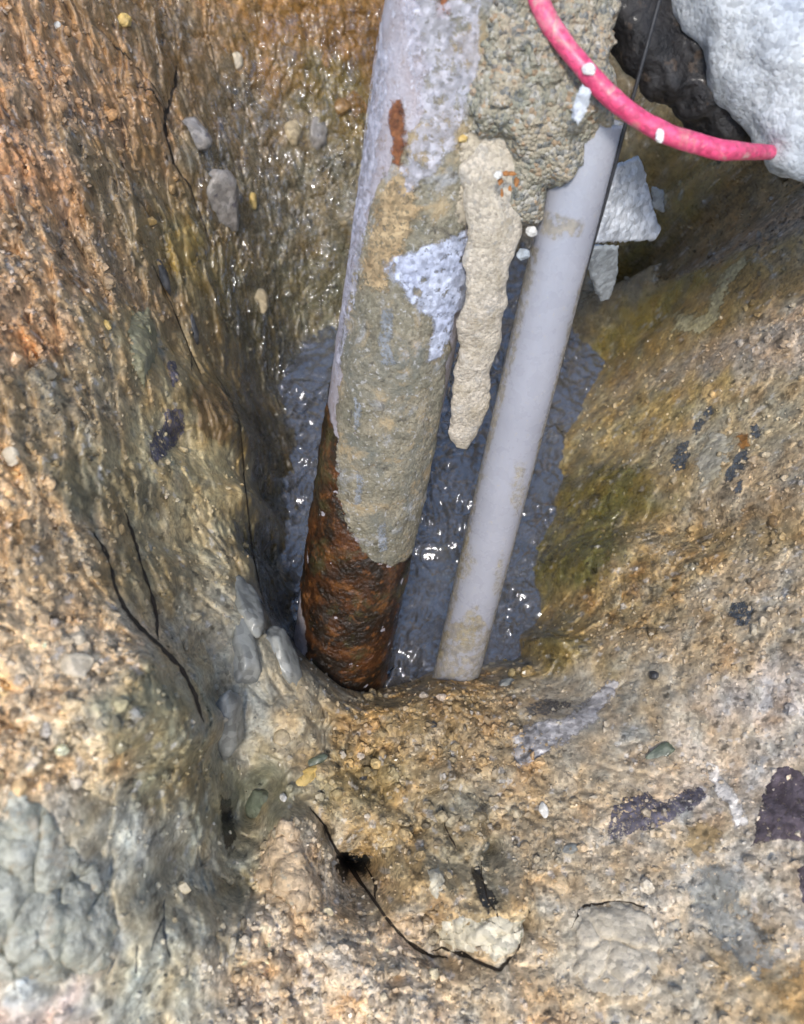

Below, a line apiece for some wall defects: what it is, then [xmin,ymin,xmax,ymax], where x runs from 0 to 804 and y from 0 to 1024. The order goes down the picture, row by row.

crack [102,32,211,244]
rust [388,99,408,168]
water stain [379,309,395,364]
peeling [384,231,468,361]
crack [94,509,204,722]
rust [299,383,412,692]
crack [310,808,522,972]